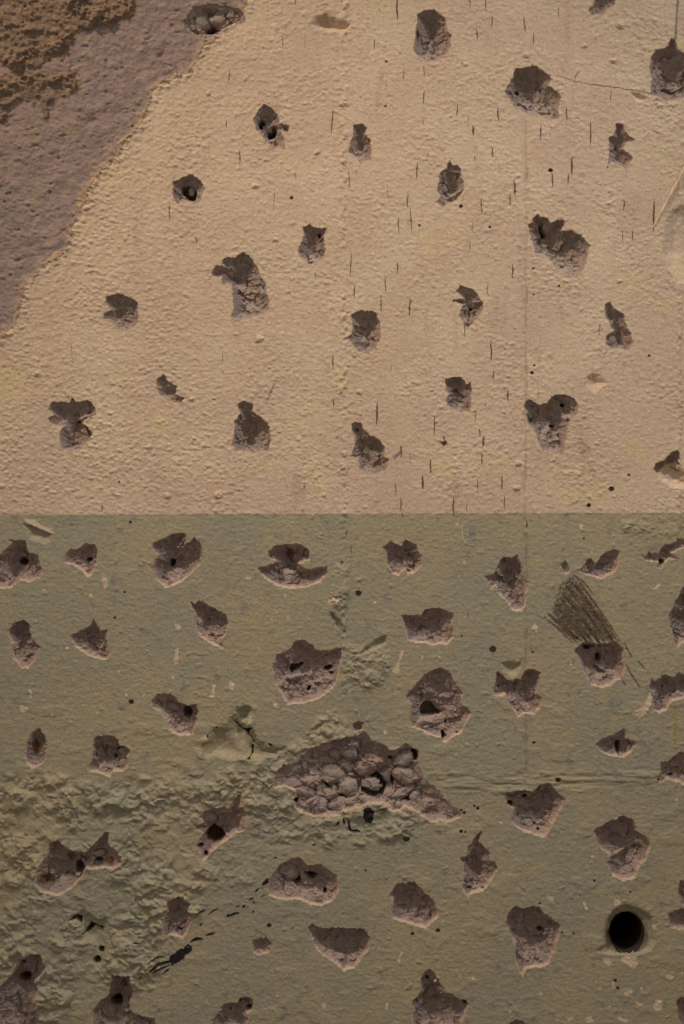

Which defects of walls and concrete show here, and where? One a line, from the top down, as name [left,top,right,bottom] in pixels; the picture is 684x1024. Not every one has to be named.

spalling [504,65,562,122]
peeling [0,0,248,342]
spalling [527,213,591,279]
spalling [211,252,270,323]
spalling [48,397,96,453]
spalling [524,394,579,456]
spalling [151,533,204,588]
spalling [245,543,328,590]
spalling [271,639,343,708]
spalling [405,667,471,743]
spalling [505,782,566,838]
spalling [32,832,122,896]